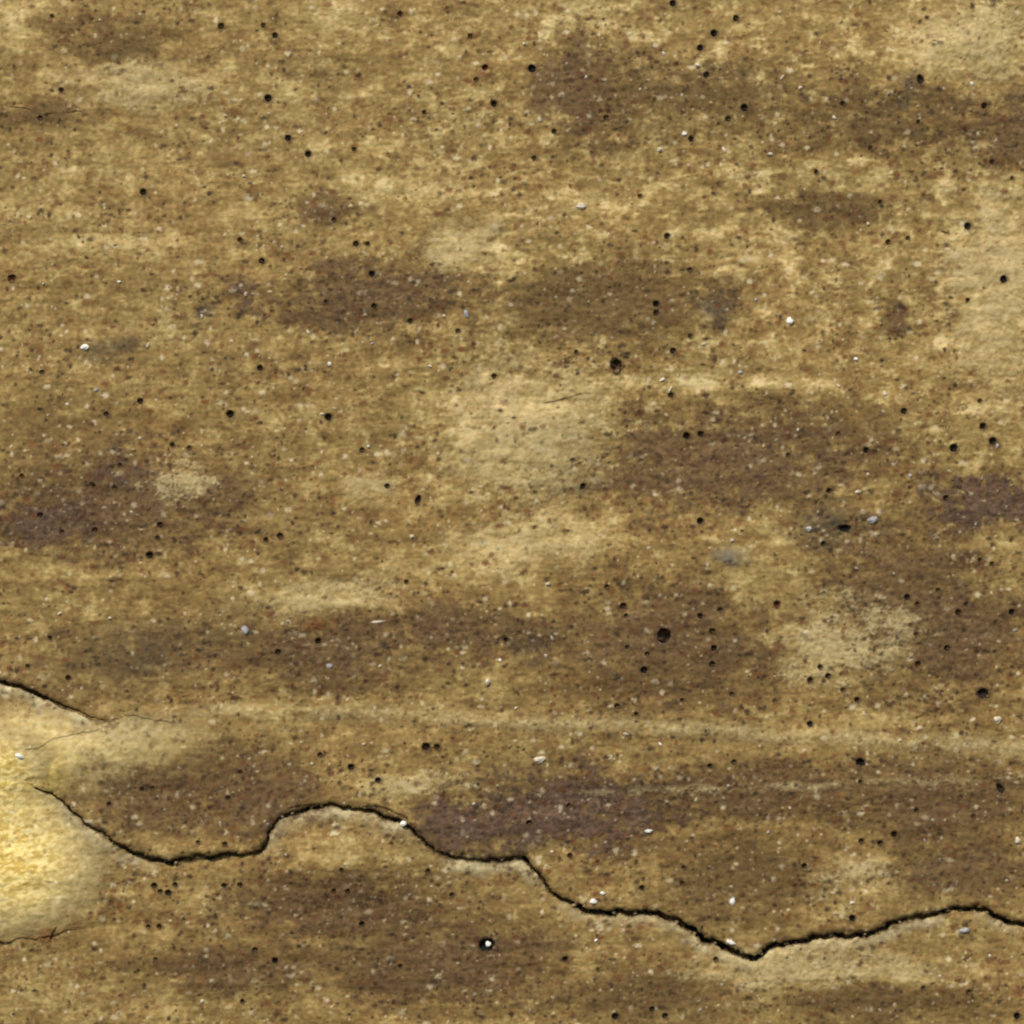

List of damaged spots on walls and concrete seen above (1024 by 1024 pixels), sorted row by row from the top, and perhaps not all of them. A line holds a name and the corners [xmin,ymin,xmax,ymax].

crack [0,679,168,739]
crack [31,784,1024,985]